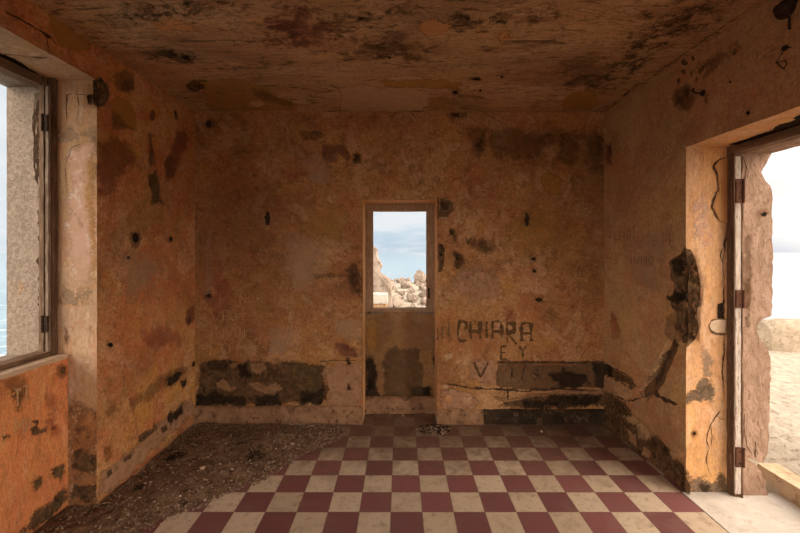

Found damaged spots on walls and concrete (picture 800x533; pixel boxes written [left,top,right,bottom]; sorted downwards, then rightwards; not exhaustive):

water stain [265,9,331,52]
water stain [613,0,733,71]
water stain [148,170,172,208]
flaking render [667,246,726,347]
crack [719,228,727,313]
water stain [365,320,433,397]
flaking render [443,359,637,392]
crack [608,339,679,405]
water stain [686,351,715,405]
crack [706,334,725,473]